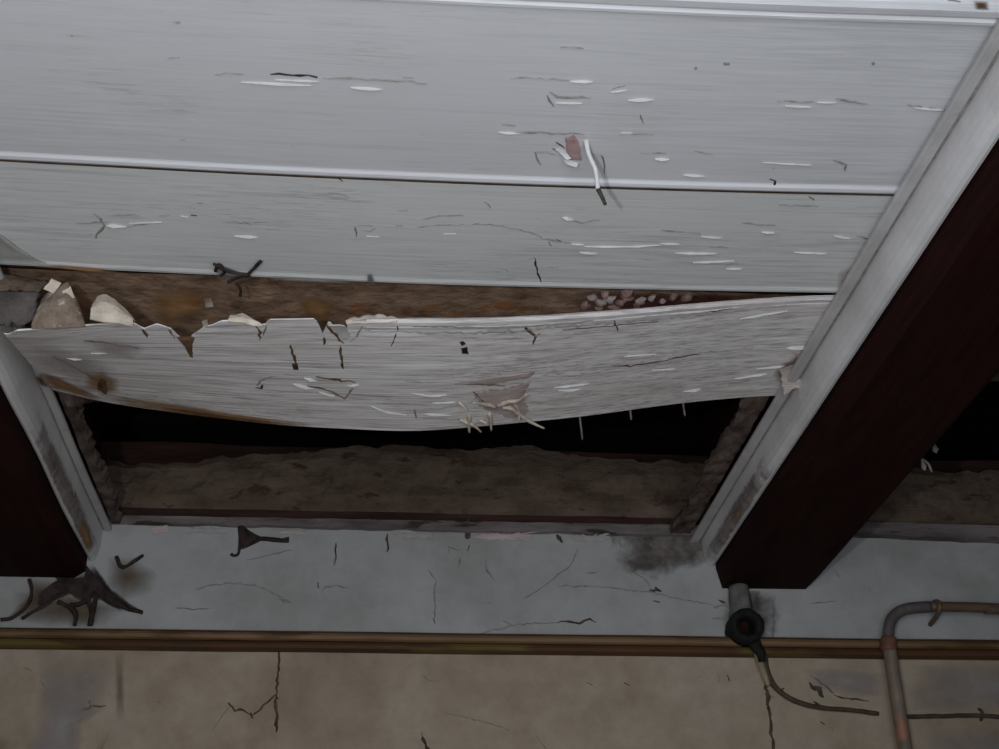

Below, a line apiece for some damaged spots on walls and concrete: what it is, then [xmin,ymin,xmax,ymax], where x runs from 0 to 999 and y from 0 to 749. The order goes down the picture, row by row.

peeling [611,85,654,102]
peeling [534,135,607,205]
peeling [571,229,741,270]
peeling [31,279,135,329]
spalling [580,289,744,312]
peeling [228,313,267,339]
peeling [323,314,399,345]
crack [212,652,280,733]
crack [763,685,775,749]